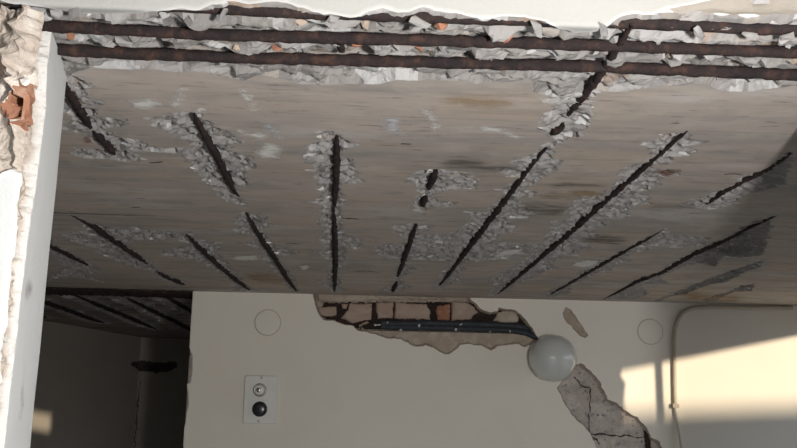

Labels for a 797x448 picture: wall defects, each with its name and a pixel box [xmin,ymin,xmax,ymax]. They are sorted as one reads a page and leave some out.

spalling [0,1,51,448]
spalling [43,211,261,334]
spalling [30,0,797,302]
spalling [303,131,538,354]
flaking render [563,307,588,338]
spalling [557,363,662,448]